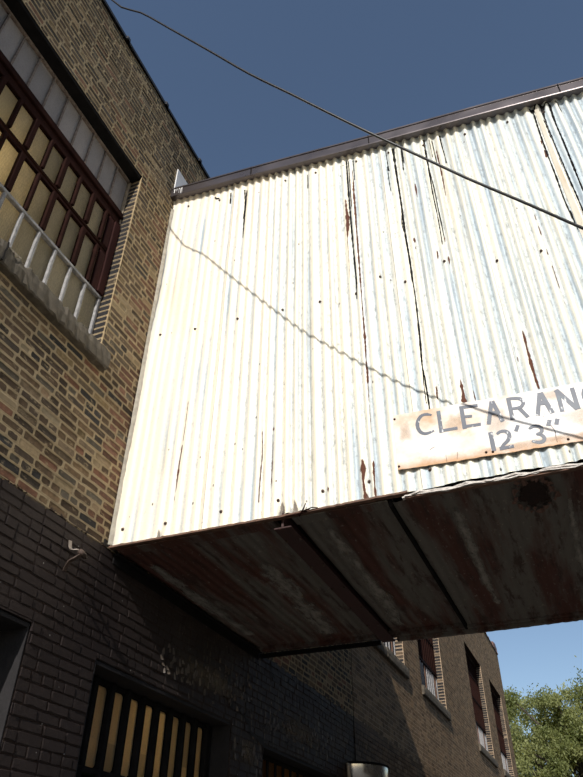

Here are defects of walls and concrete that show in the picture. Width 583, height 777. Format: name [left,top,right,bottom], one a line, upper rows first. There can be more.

corrosion [345,171,371,423]
corrosion [517,331,540,389]
corrosion [108,459,583,550]